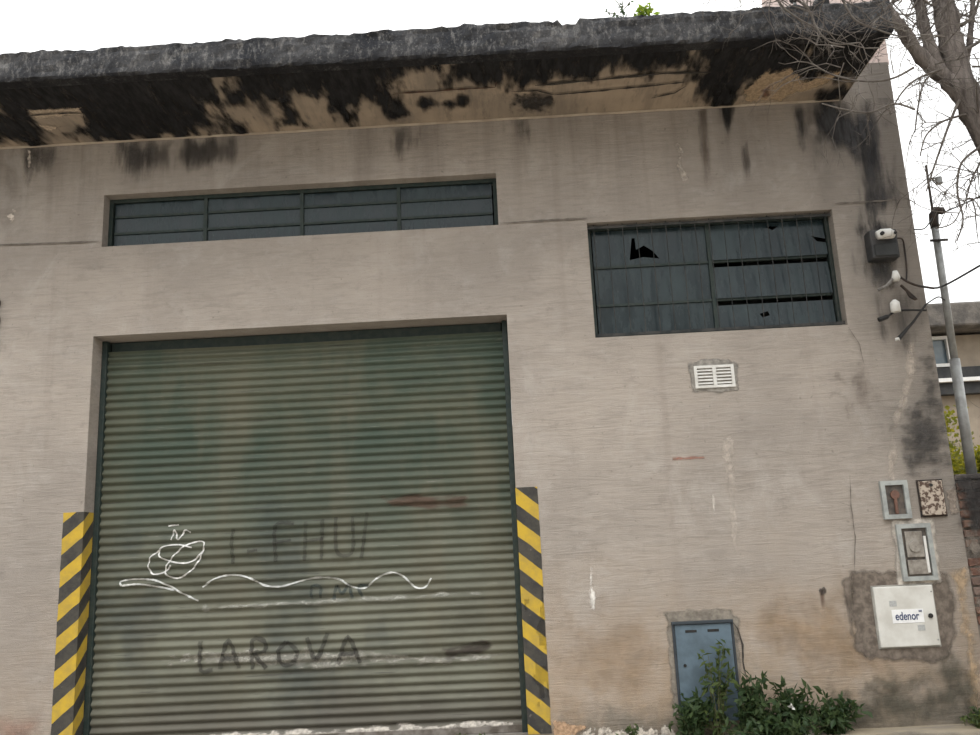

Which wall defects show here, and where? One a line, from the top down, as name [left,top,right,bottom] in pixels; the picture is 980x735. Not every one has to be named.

damp [0,40,891,211]
damp [872,262,891,283]
damp [904,380,944,468]
rust [390,495,466,508]
crack [837,484,856,569]